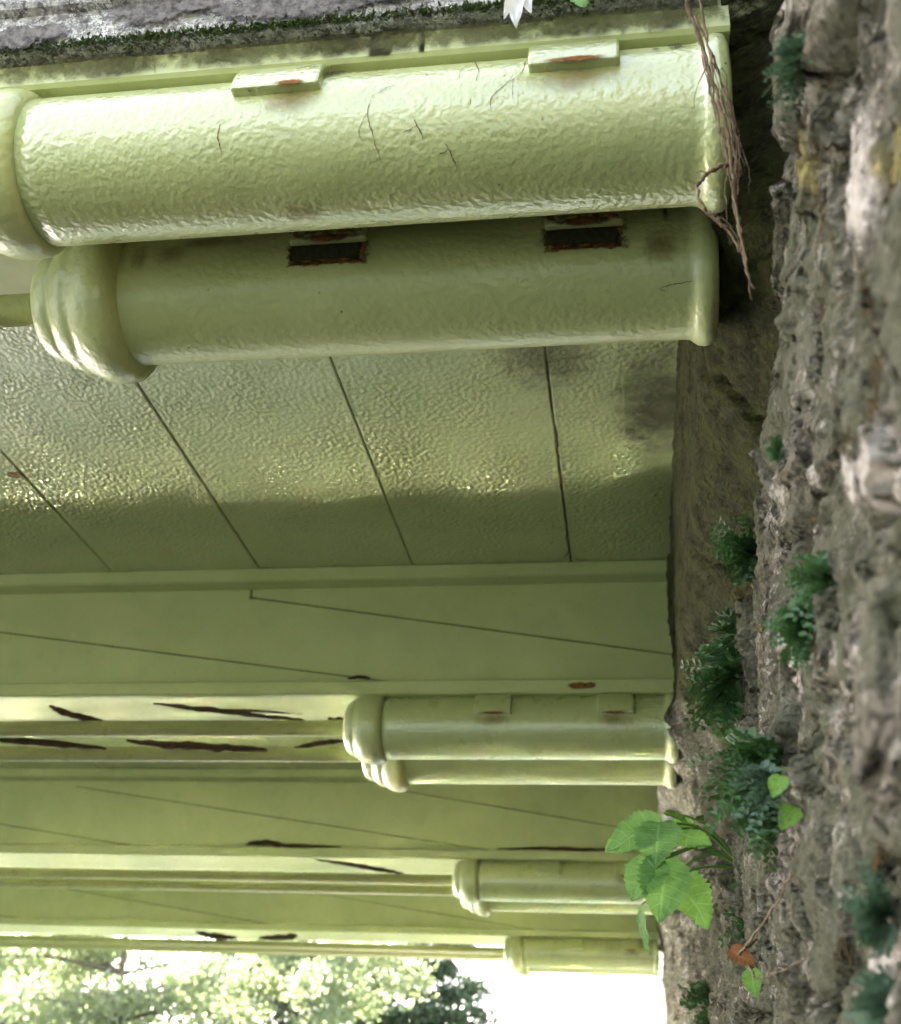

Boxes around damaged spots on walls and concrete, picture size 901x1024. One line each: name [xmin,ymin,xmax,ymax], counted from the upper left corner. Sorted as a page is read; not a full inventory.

water stain [624,365,675,443]